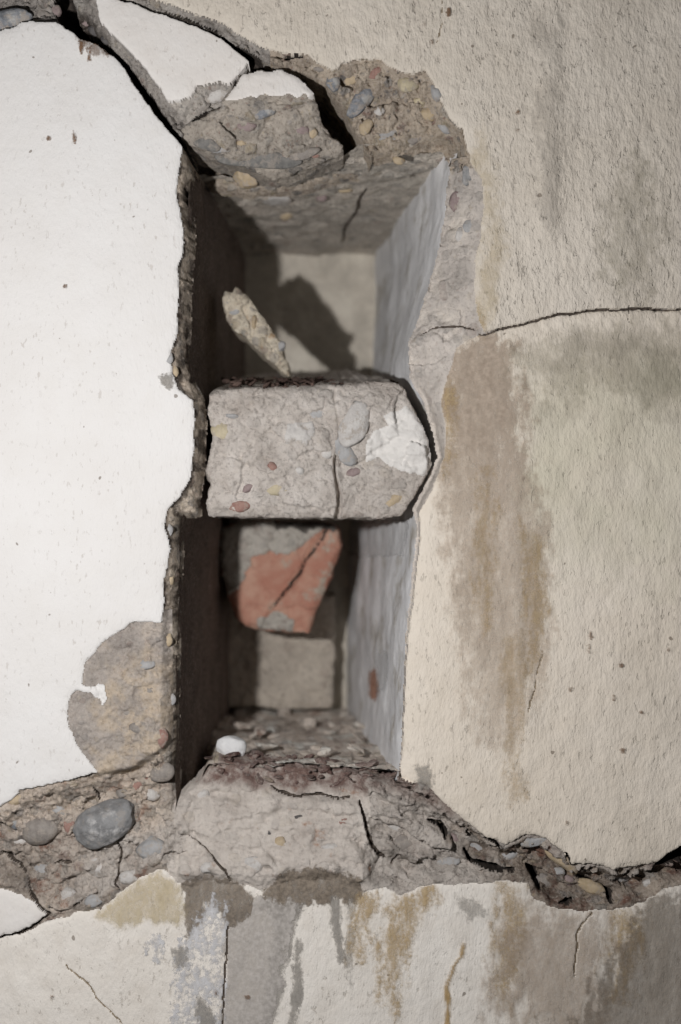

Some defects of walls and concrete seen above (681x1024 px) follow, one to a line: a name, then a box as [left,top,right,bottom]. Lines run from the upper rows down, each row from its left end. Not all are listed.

spalling [0,0,62,31]
spalling [73,0,252,144]
crack [341,188,367,243]
spalling [122,0,495,738]
crack [423,305,681,336]
spalling [0,147,681,934]
crack [0,842,123,938]
water stain [98,867,363,1024]
crack [428,818,614,976]
crack [654,846,681,865]